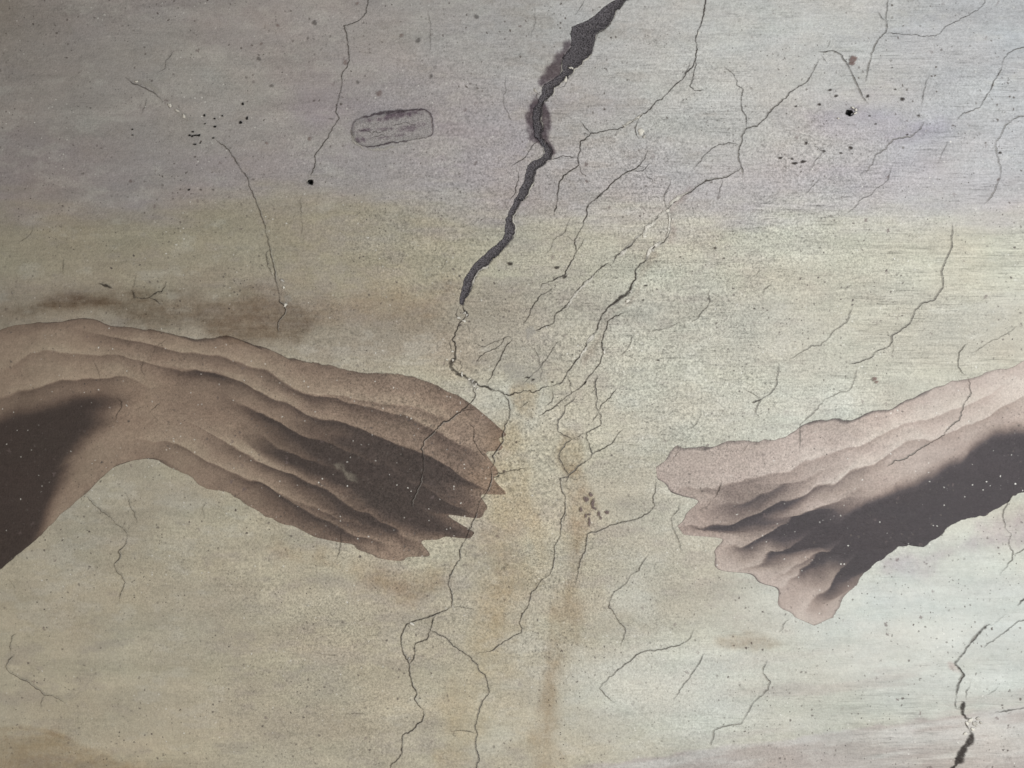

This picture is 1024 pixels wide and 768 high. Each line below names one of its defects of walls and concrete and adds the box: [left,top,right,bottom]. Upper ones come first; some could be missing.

crack [312,0,369,173]
crack [219,142,287,329]
crack [390,0,986,768]
crack [952,599,1024,768]